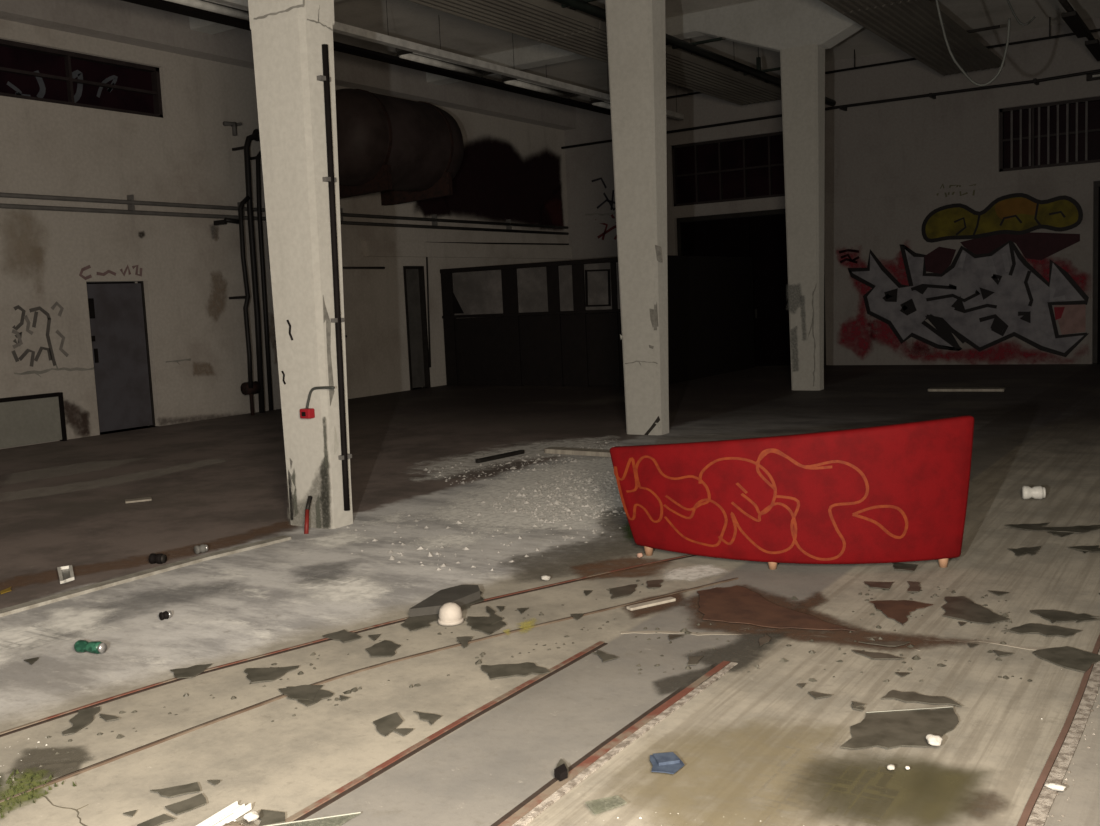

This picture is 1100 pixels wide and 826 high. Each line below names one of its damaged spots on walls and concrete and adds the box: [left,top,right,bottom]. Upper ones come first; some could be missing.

crack [254,0,333,31]
damp [625,585,966,693]
crack [43,795,87,826]
damp [654,730,1002,826]